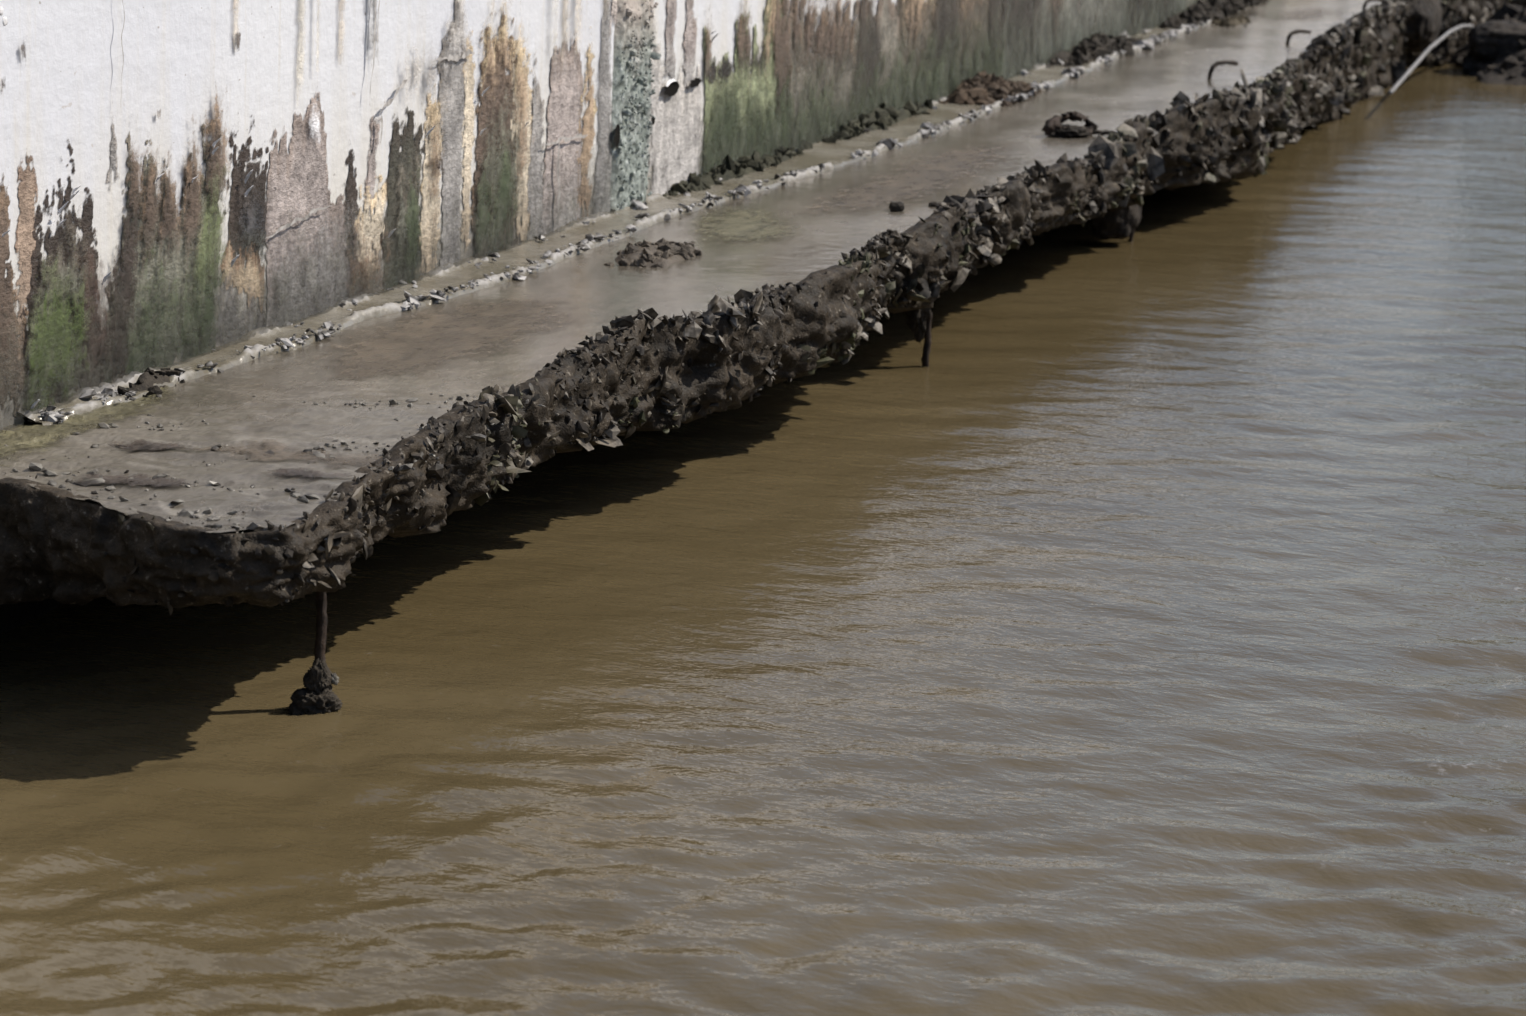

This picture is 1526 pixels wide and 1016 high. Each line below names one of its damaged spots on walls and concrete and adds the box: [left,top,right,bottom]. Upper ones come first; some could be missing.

peeling [0,93,389,422]
water stain [0,0,627,425]
flaking render [406,57,442,273]
peeling [460,4,534,258]
water stain [648,0,702,195]
peeling [610,289,778,391]
peeling [799,177,1030,375]
peeling [785,0,1097,152]
peeling [1088,119,1165,207]
peeling [1169,0,1411,151]
peeling [425,366,681,516]
spalling [284,482,392,715]